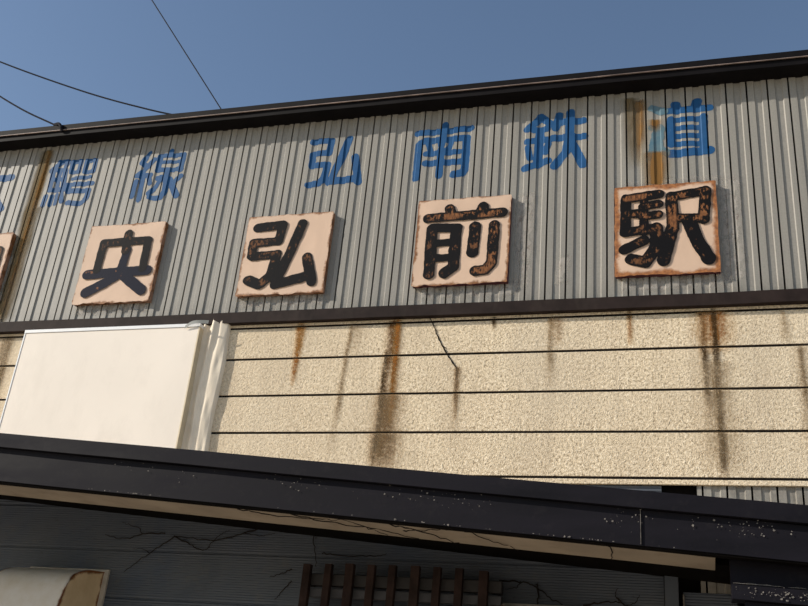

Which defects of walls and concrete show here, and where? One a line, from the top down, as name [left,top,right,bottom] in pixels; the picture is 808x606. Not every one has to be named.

rust [625,98,664,185]
rust [292,324,304,376]
rust [371,320,400,464]
crack [430,318,457,378]
rust [699,308,726,470]